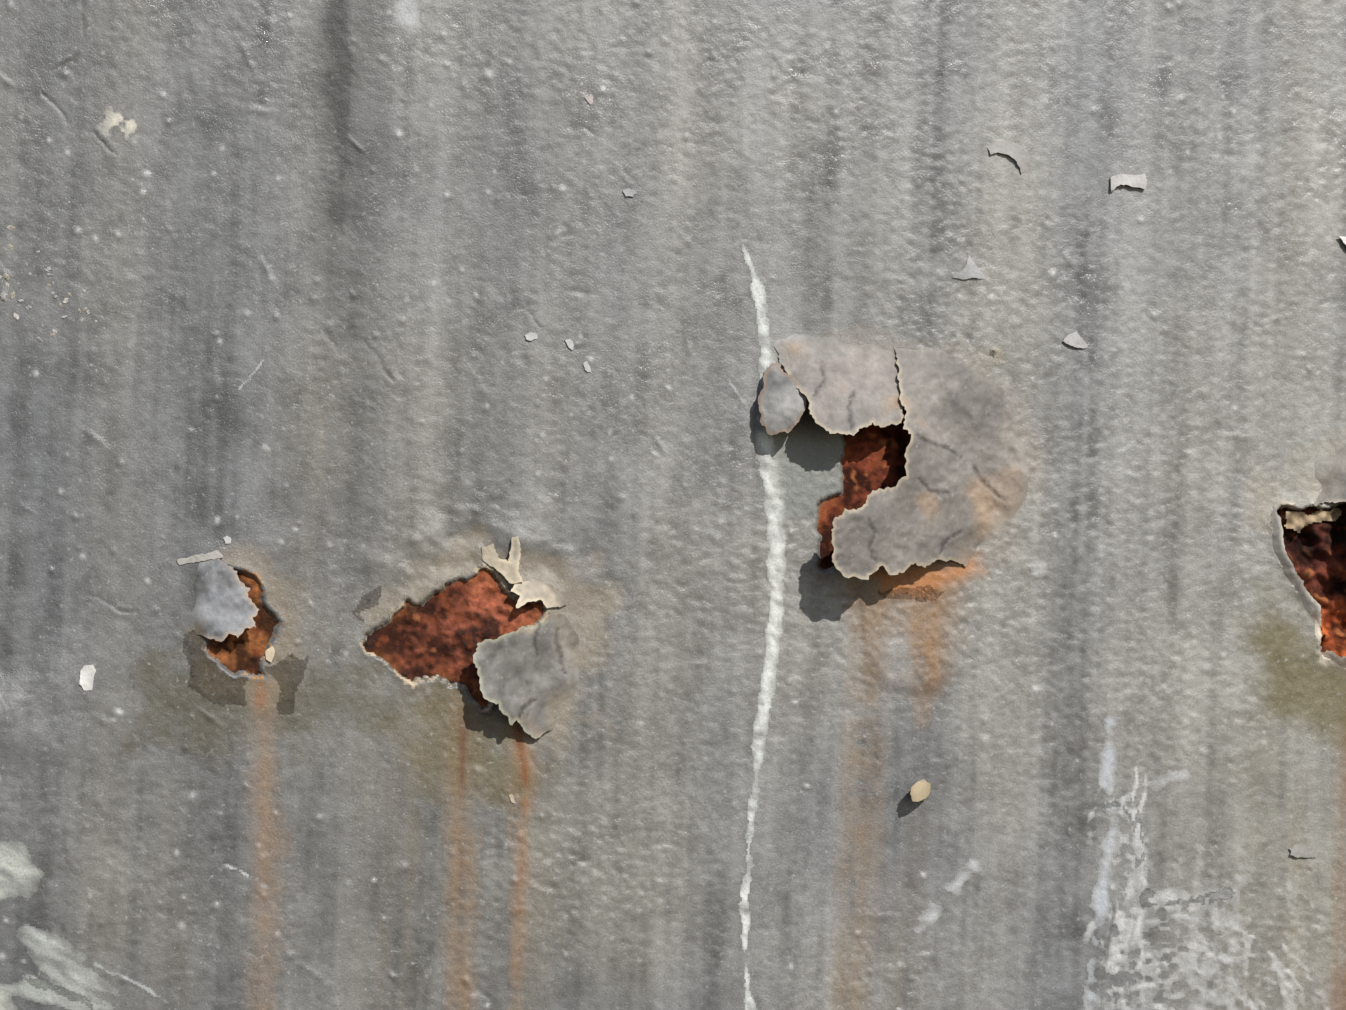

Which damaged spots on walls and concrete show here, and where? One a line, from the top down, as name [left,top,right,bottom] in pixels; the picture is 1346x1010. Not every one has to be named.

rust [0,225,32,320]
rust [25,250,98,341]
peeling [177,536,313,710]
peeling [340,521,628,765]
damp [727,244,787,1010]
peeling [758,322,1052,602]
peeling [1242,425,1346,668]
rust [117,630,566,1010]
damp [1080,715,1323,1010]